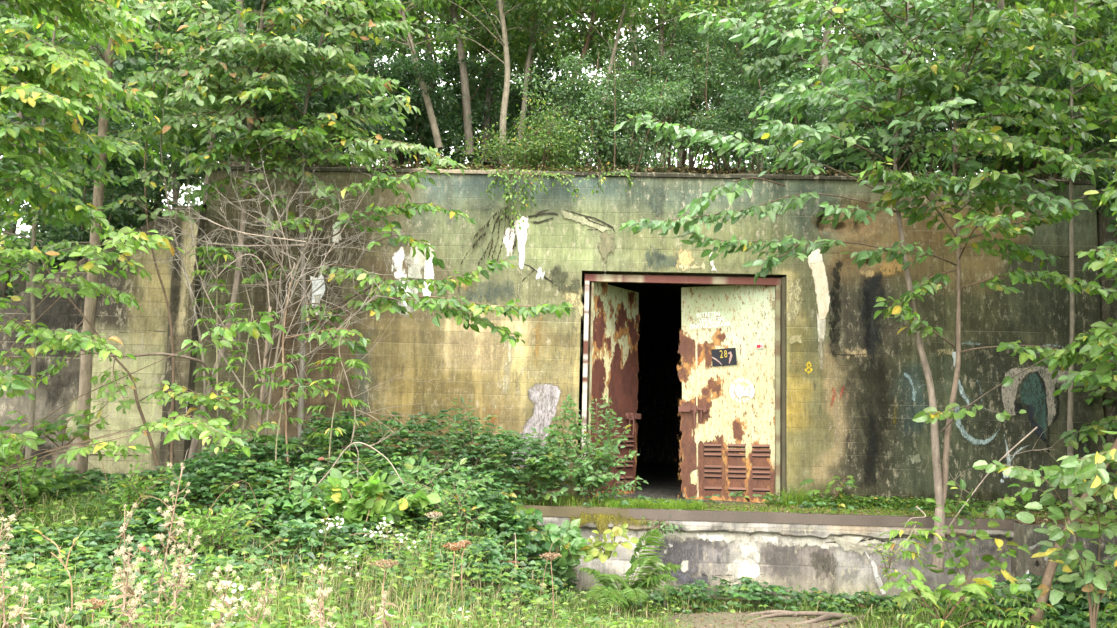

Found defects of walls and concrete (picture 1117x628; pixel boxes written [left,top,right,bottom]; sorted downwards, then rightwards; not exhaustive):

corrosion [587,282,640,497]
corrosion [677,328,775,503]
damp [808,249,843,369]
damp [857,272,890,487]